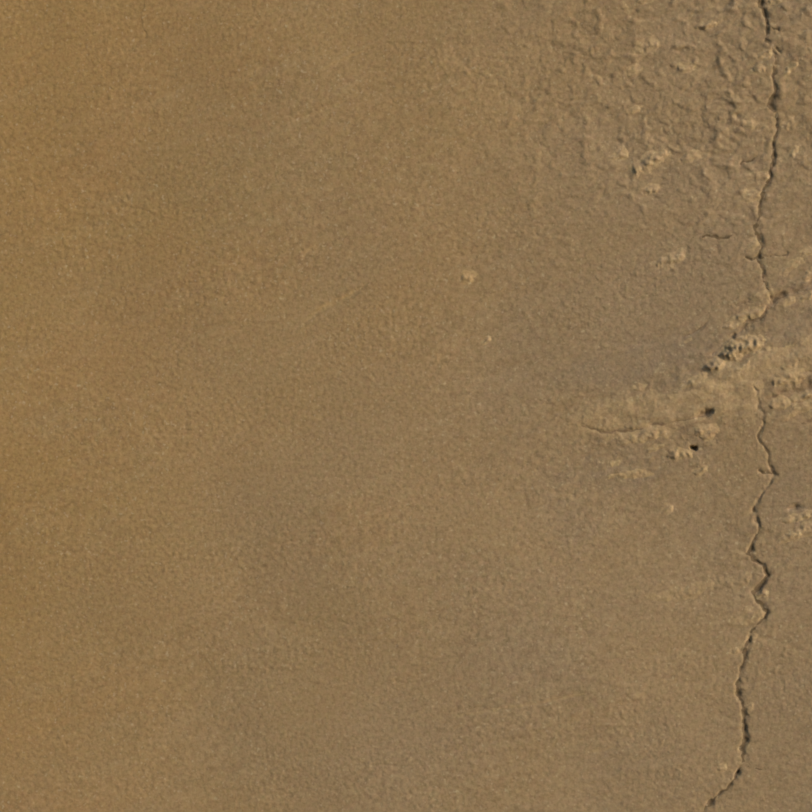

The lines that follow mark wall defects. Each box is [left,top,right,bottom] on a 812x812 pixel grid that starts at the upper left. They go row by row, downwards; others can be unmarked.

crack [702,0,812,337]
crack [757,427,774,474]
crack [704,494,770,810]